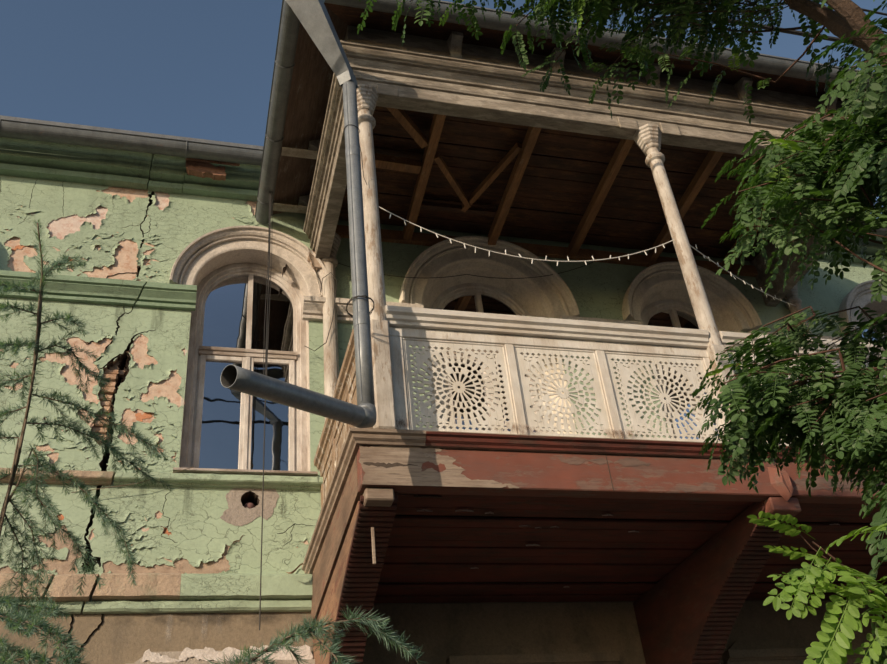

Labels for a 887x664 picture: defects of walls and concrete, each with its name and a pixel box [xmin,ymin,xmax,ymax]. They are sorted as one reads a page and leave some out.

peeling [0,186,173,283]
crack [107,192,155,277]
peeling [0,334,185,470]
crack [79,307,155,573]
peeling [359,446,519,498]
peeling [559,457,651,467]
peeling [678,482,717,492]
peeling [793,474,885,490]
peeling [0,504,245,574]
peeling [142,645,313,663]